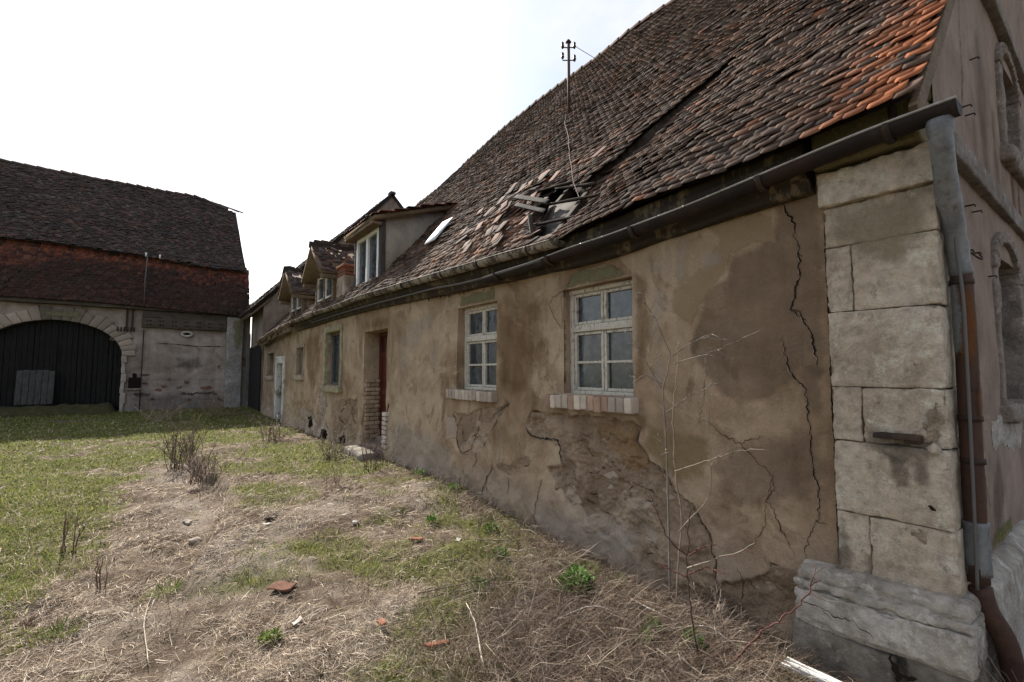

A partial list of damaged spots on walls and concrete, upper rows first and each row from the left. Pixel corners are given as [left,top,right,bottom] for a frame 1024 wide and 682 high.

damp [672,214,776,323]
rust [958,291,977,364]
flaking render [296,391,358,446]
flaking render [454,405,509,455]
crack [698,204,839,561]
flaking render [525,412,797,644]